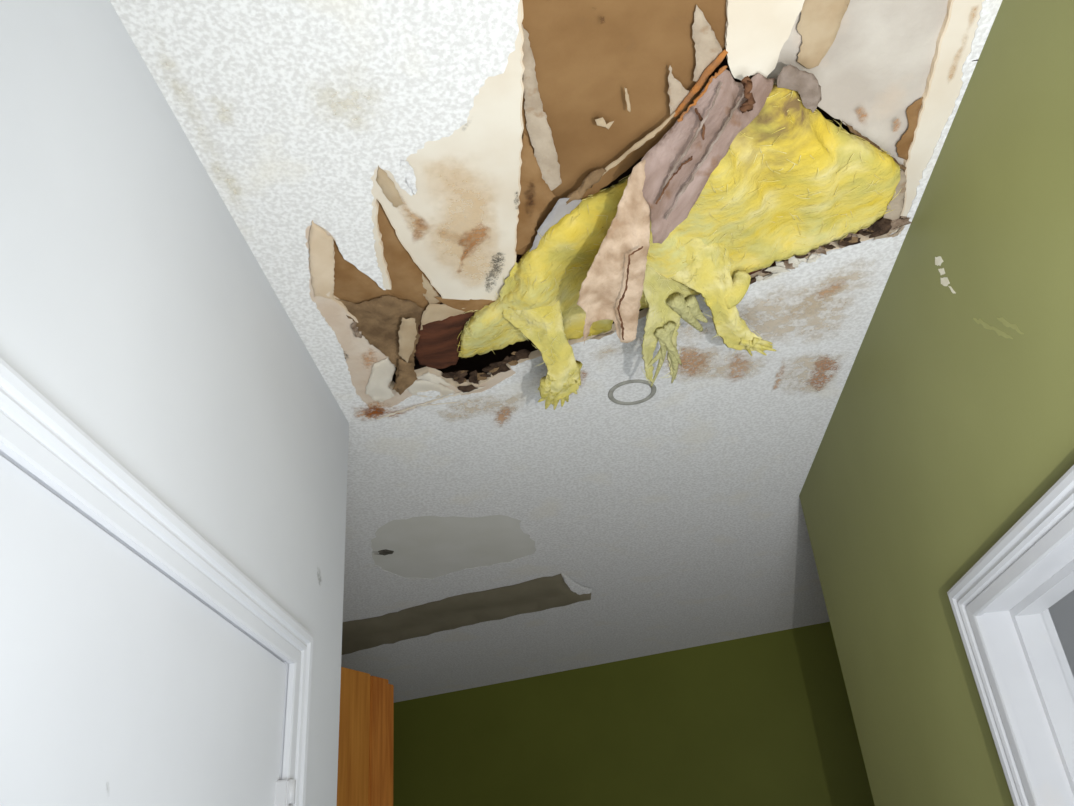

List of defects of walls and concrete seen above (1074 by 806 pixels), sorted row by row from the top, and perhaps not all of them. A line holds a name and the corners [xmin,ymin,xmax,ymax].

peeling [371,0,524,301]
peeling [810,0,984,255]
water stain [460,228,486,260]
water stain [486,253,504,288]
peeling [305,220,516,408]
water stain [746,276,856,333]
water stain [678,351,751,378]
water stain [798,358,838,388]